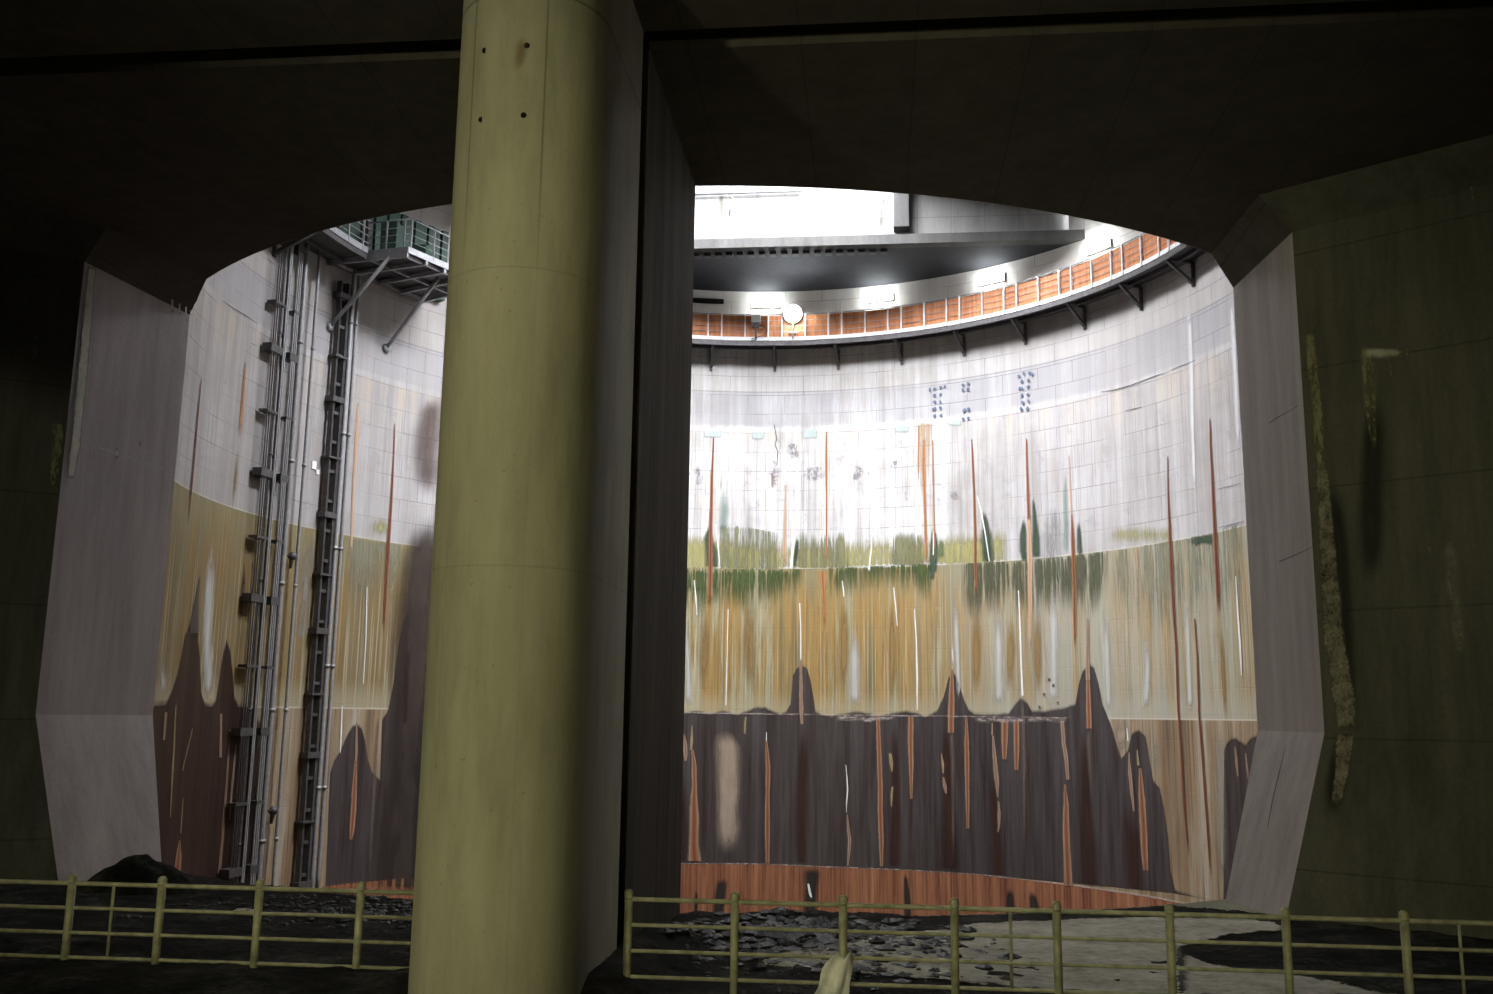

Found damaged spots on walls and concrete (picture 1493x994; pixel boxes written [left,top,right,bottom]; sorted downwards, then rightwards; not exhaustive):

leakage [153,569,260,885]
leakage [326,532,434,888]
corrosion [383,425,395,625]
corrosion [917,423,937,602]
corrosion [680,708,1181,916]
leakage [681,587,1192,902]
corrosion [941,650,970,829]
corrosion [1008,439,1041,681]
corrosion [1136,457,1189,846]
corrosion [1209,419,1220,606]
leakage [1306,335,1355,802]
leakage [1362,349,1409,563]